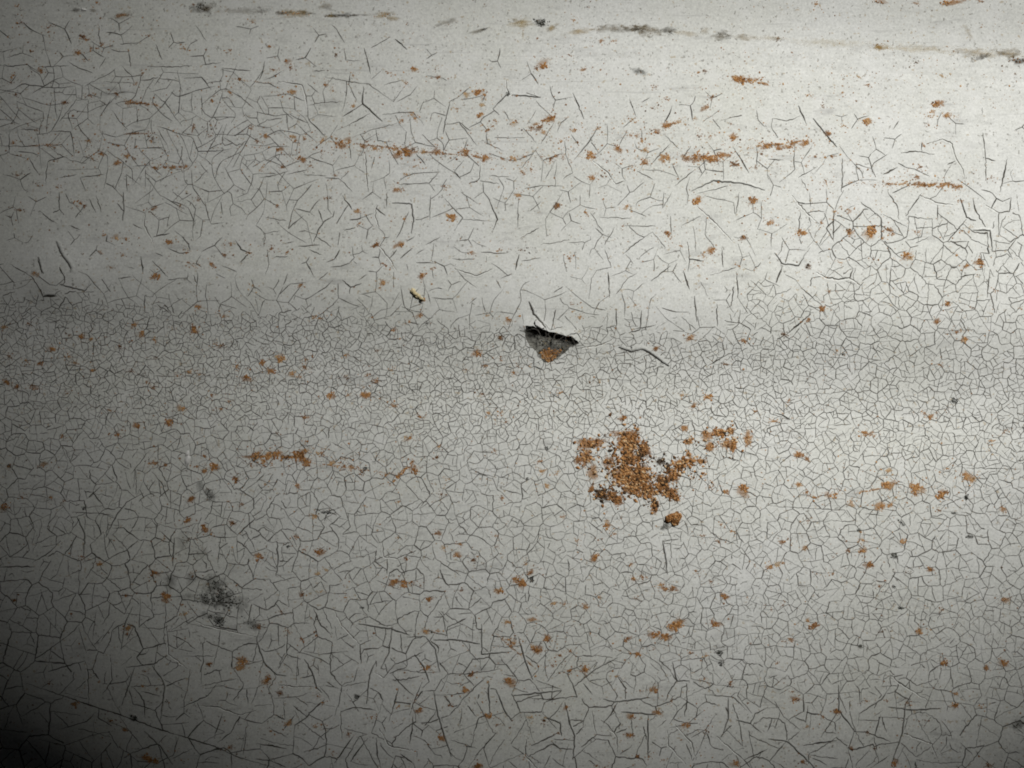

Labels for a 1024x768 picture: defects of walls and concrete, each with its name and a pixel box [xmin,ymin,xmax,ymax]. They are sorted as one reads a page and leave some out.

corrosion [6,0,130,98]
corrosion [5,22,1000,341]
crack [0,32,1017,367]
spalling [525,321,579,363]
corrosion [0,286,453,619]
crack [5,453,177,568]
crack [205,519,301,576]
crack [344,508,459,575]
corrosion [392,386,984,766]
crack [662,513,738,574]
crack [27,600,973,768]